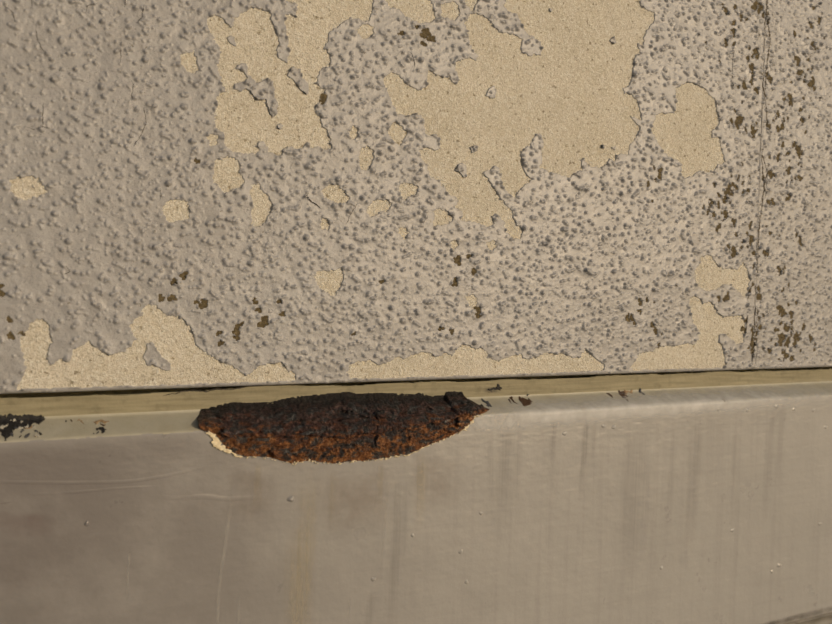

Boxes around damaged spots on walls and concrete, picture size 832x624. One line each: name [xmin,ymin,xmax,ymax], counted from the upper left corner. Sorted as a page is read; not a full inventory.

peeling [206,0,374,227]
peeling [384,0,654,239]
peeling [651,82,726,178]
crack [762,0,771,129]
spalling [730,6,821,138]
spalling [768,141,803,183]
peeling [630,162,816,371]
crack [746,149,769,359]
peeling [6,271,295,392]
rust [197,384,502,465]
peeling [346,344,604,379]
rust [508,394,533,406]